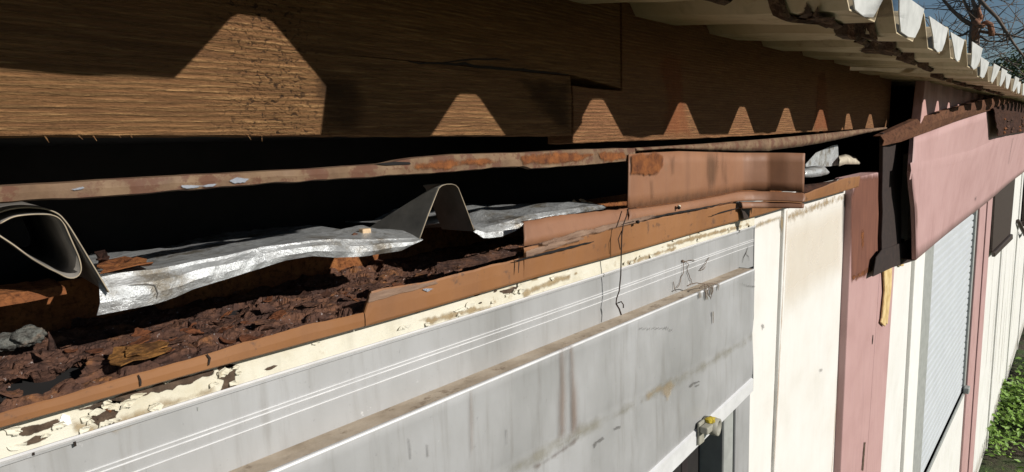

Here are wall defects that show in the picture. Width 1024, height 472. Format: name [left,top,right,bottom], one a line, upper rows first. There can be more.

crack [408,58,569,75]
corrosion [993,100,1024,136]
corrosion [521,151,663,175]
peeling [526,215,654,257]
peeling [624,224,752,265]
peeling [369,281,438,302]
peeling [425,273,577,326]
peeling [3,364,242,451]